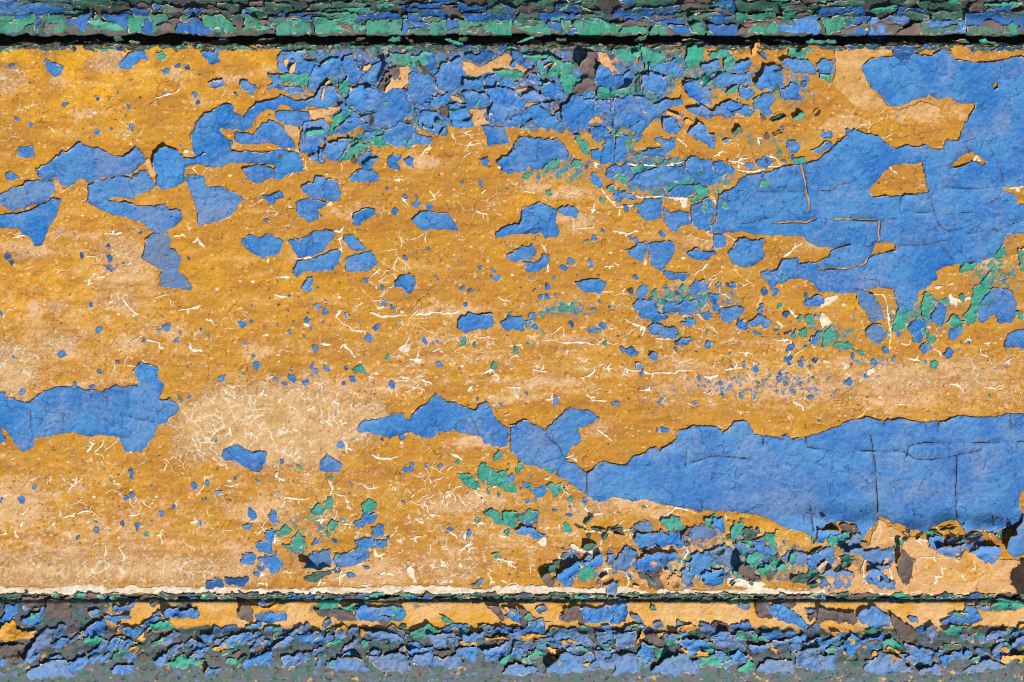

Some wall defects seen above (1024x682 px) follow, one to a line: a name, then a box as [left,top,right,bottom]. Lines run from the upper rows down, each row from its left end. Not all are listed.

crack [12,187,89,269]
peeling [0,0,1024,400]
crack [919,173,1023,259]
peeling [0,362,192,452]
crack [29,127,880,587]
crack [857,293,944,361]
crack [902,336,1024,495]
crack [0,510,38,555]
peeling [0,393,1024,681]
crack [844,439,976,585]